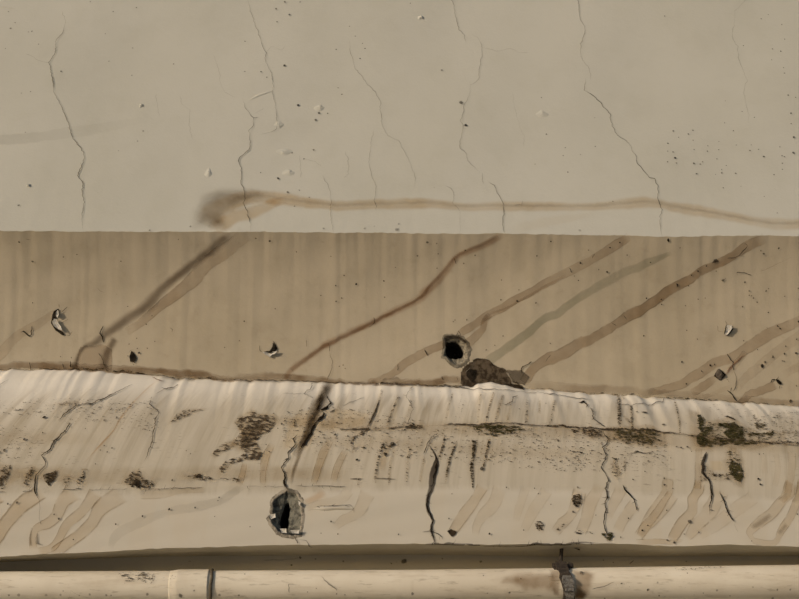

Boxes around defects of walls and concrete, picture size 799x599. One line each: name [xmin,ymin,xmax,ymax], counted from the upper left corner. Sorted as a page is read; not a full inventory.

crack [49,37,85,209]
crack [238,108,257,222]
hole [446,342,464,359]
mould [0,428,31,489]
mould [43,471,84,486]
mould [125,471,154,488]
hole [280,503,290,530]
crack [281,386,343,489]
damp [213,358,799,488]
crack [404,378,637,547]